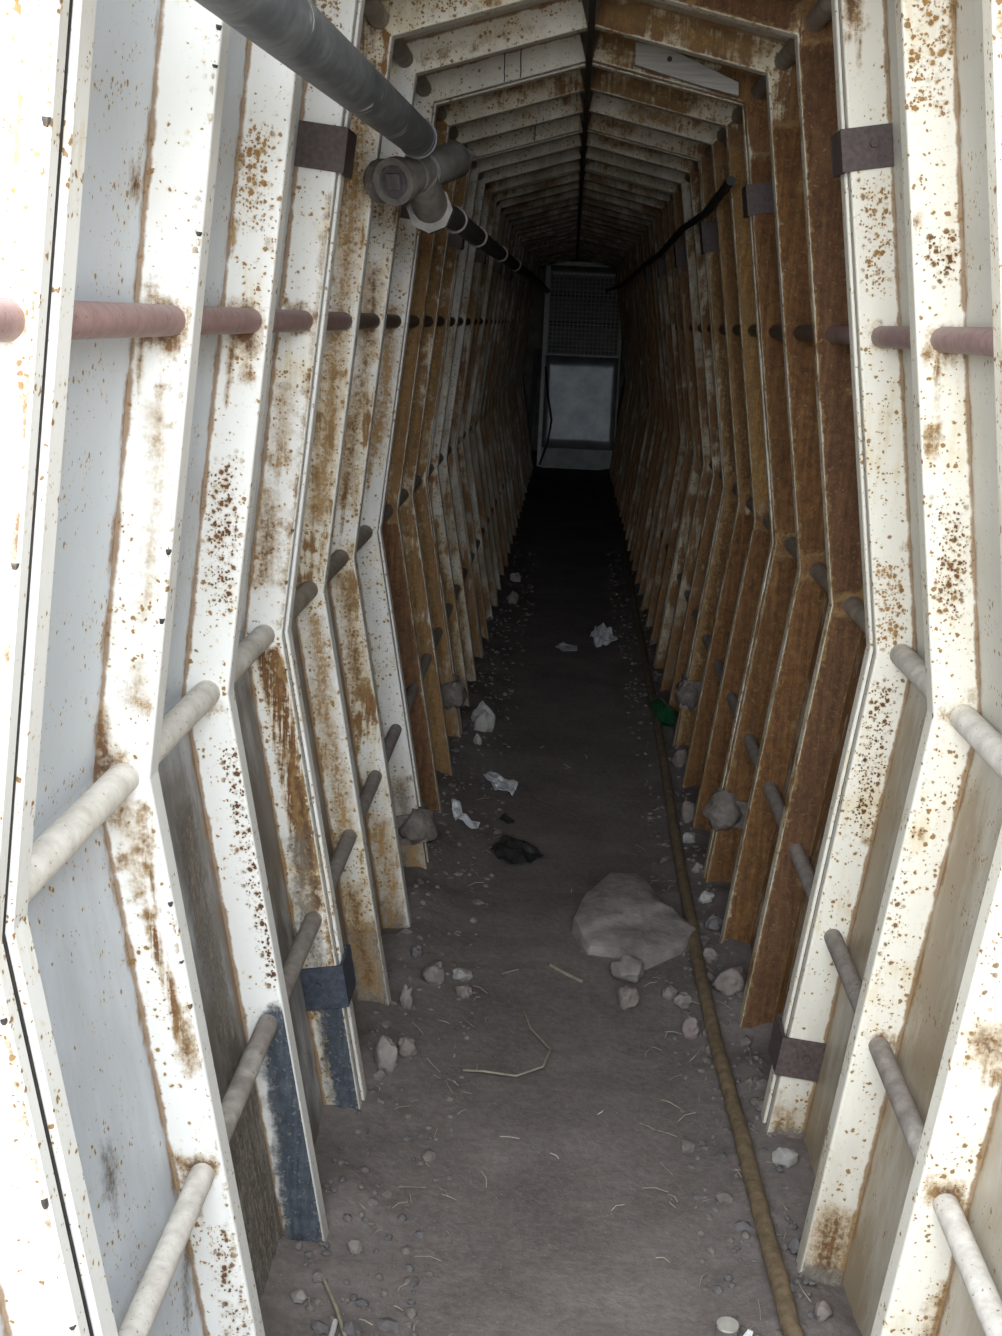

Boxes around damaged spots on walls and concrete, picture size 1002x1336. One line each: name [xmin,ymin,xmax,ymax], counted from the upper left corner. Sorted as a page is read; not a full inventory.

rust [913,219,962,284]
rust [137,329,186,378]
rust [923,351,953,380]
rust [924,424,940,454]
rust [415,489,471,683]
rust [931,499,968,616]
rust [382,521,440,811]
rust [258,647,326,912]
rust [310,616,352,845]
rust [876,782,925,980]
rust [968,1017,1002,1086]
rust [814,1210,854,1273]